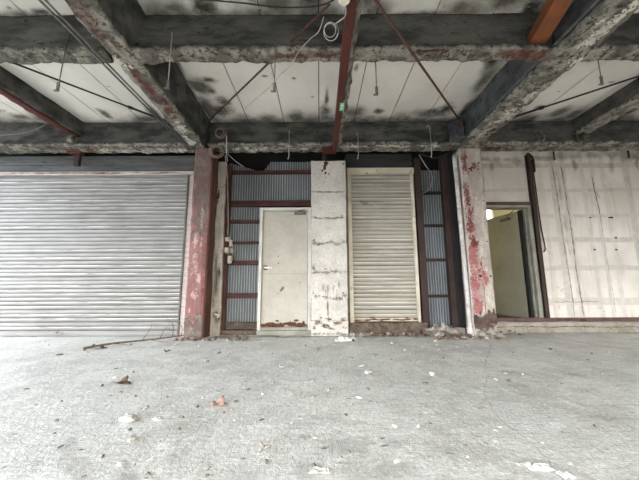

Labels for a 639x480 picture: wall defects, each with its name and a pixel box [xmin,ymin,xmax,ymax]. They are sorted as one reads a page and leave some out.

spalling [555,0,639,69]
water stain [476,60,498,89]
water stain [188,78,281,123]
water stain [289,95,333,123]
water stain [345,102,472,122]
spalling [461,82,551,174]
peeling [96,119,211,340]
spalling [463,182,527,335]
rust [260,319,308,327]
rust [348,313,418,332]